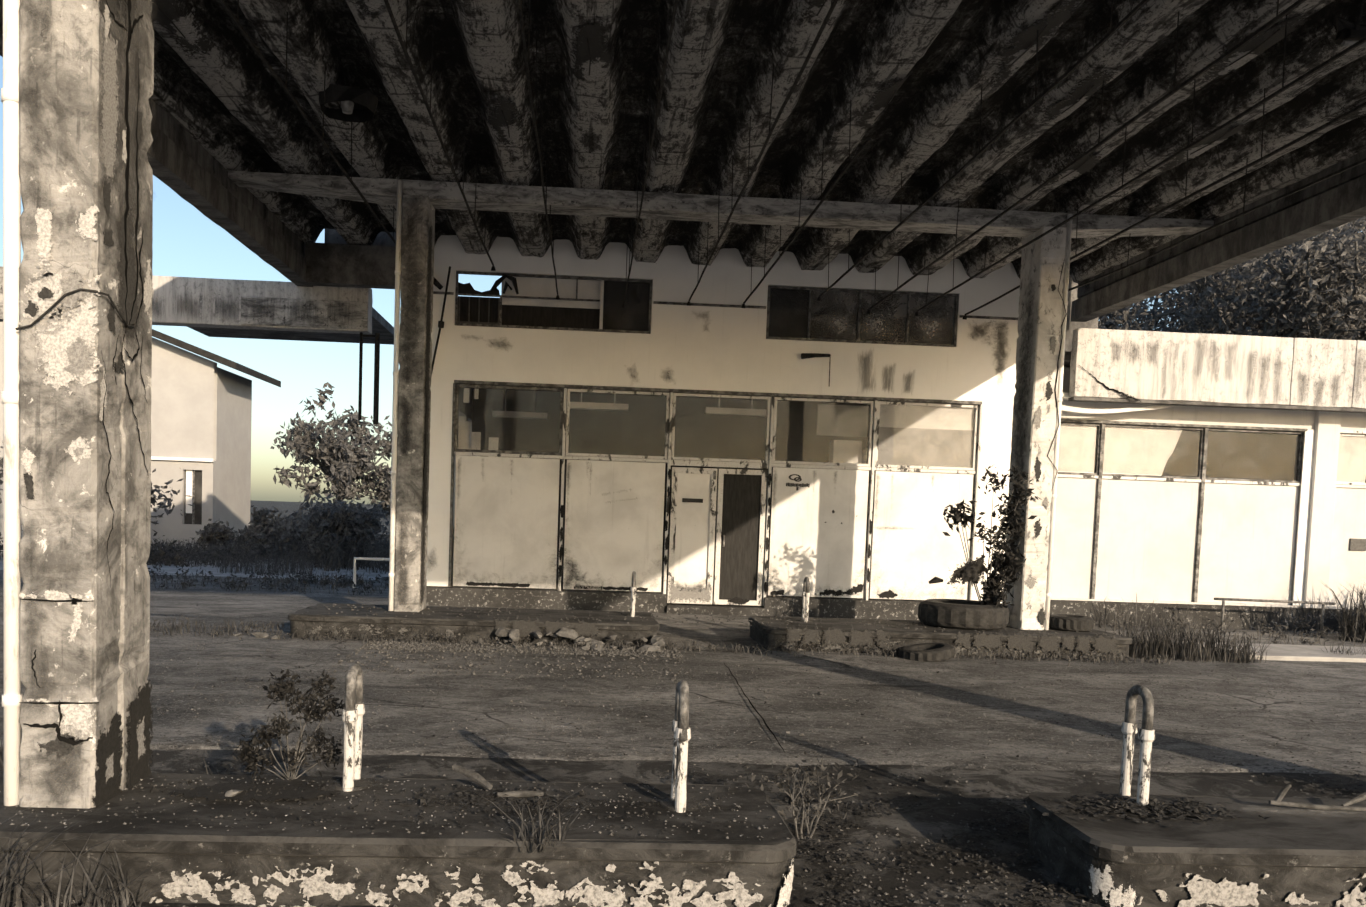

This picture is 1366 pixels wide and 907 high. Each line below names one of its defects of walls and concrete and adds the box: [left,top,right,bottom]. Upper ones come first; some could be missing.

spalling [75,5,143,248]
peeling [17,208,125,421]
crack [96,0,149,588]
spalling [143,259,154,315]
crack [1079,365,1141,403]
peeling [55,697,100,741]
crack [724,663,785,753]
peeling [149,858,794,907]
peeling [1089,864,1270,907]
peeling [1285,873,1366,907]